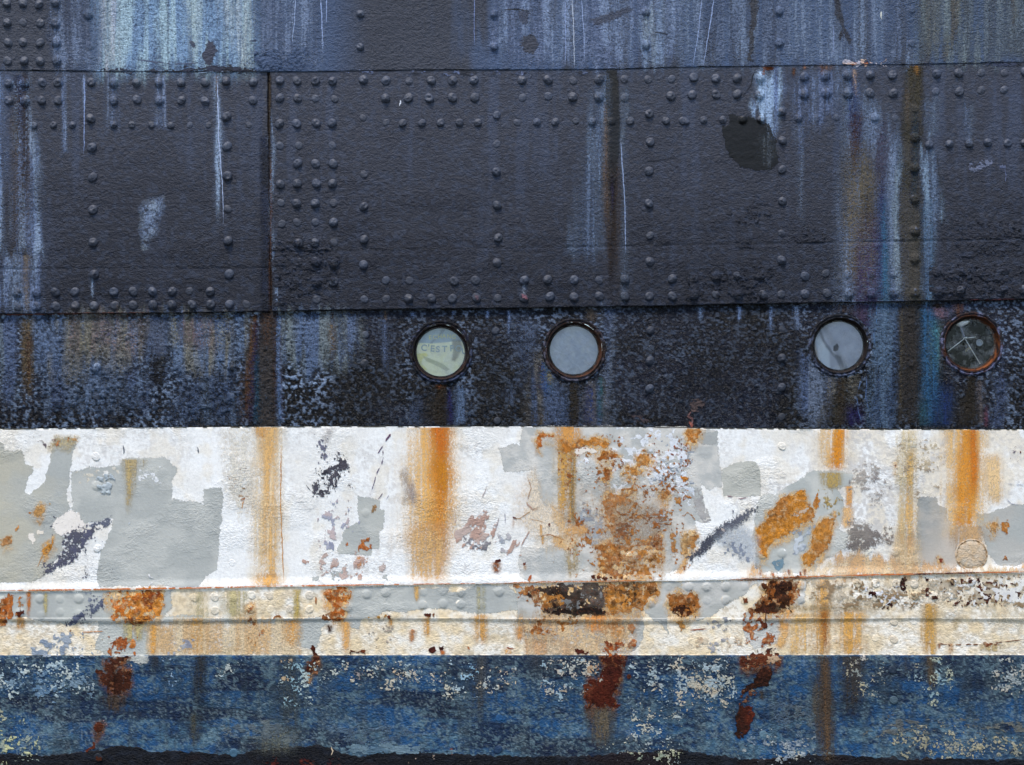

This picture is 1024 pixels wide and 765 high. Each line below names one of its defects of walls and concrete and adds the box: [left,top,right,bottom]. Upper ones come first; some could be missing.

leakage [0,73,250,423]
corrosion [0,76,399,761]
corrosion [407,382,703,743]
leakage [489,0,1024,428]
corrosion [731,376,1024,759]